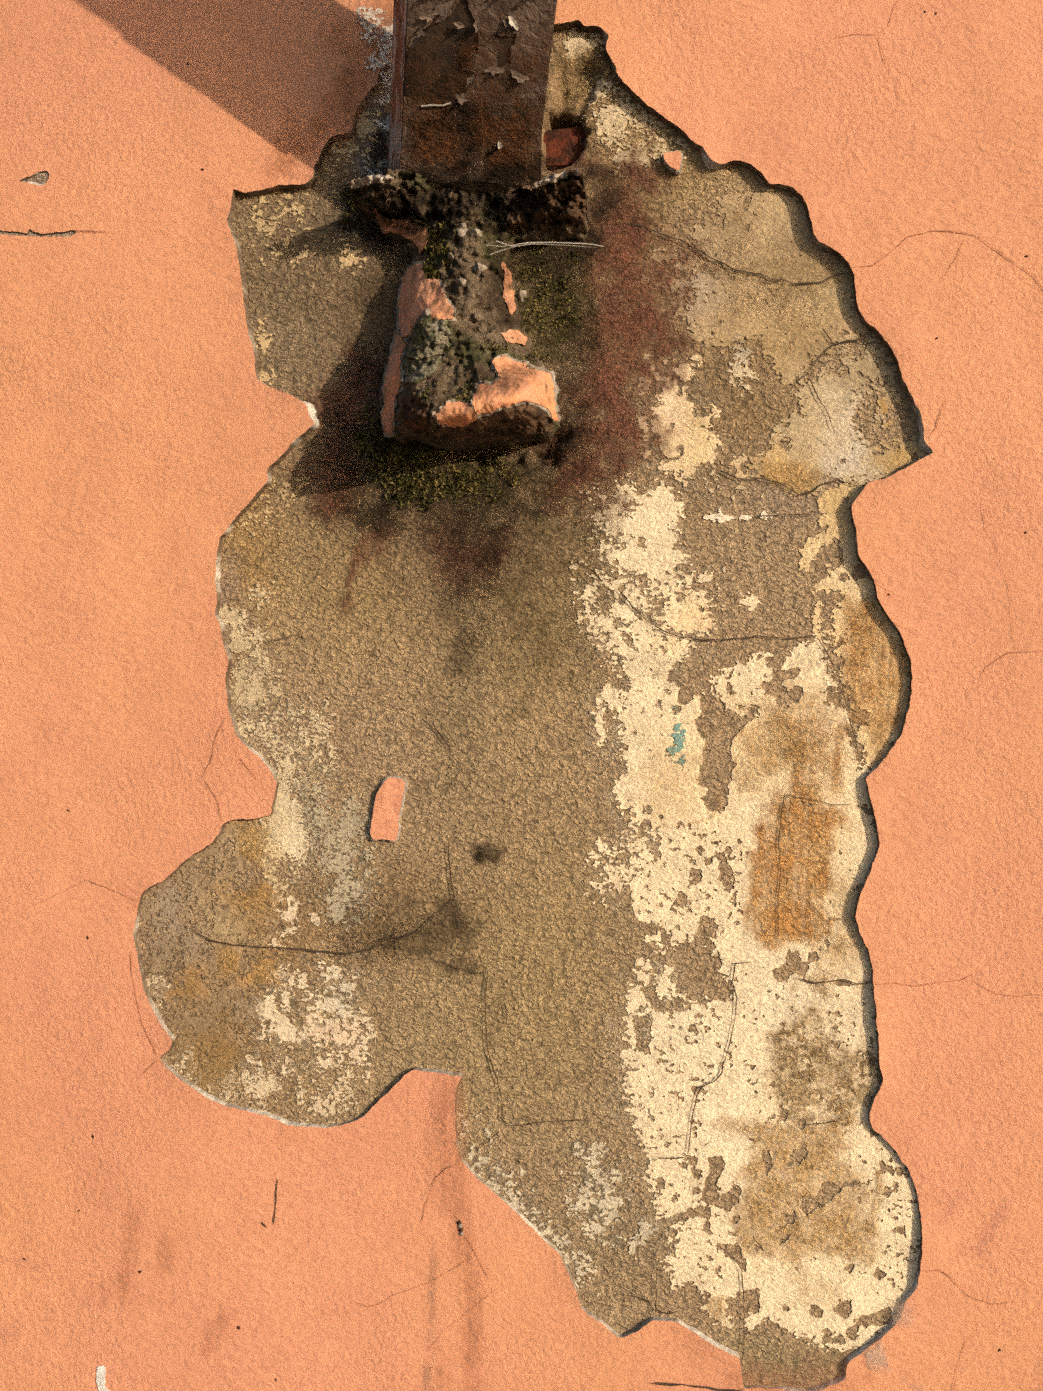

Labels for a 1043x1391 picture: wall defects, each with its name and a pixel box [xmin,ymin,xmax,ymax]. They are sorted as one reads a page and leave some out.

peeling [356,6,393,40]
peeling [503,16,519,31]
damp [338,186,506,249]
damp [492,160,698,488]
crack [620,221,1043,288]
damp [309,349,384,518]
peeling [133,20,933,1391]
corrosion [746,709,844,951]